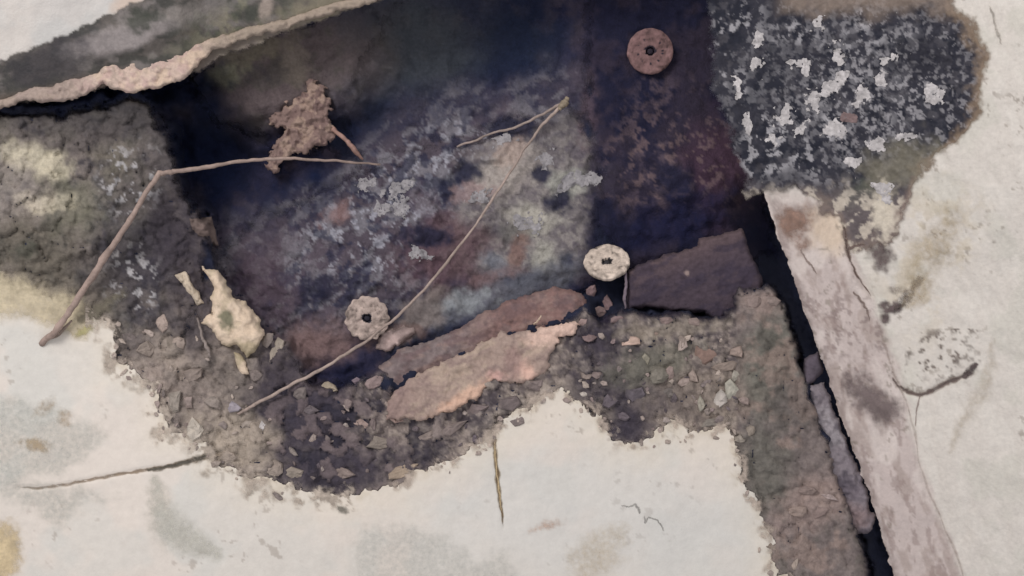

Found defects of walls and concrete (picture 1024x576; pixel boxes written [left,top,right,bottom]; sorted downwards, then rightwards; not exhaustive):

flaking render [0,0,377,109]
flaking render [264,79,336,174]
rust [584,0,779,277]
damp [707,0,989,270]
flaking render [190,216,218,246]
damp [0,0,604,387]
crack [843,227,870,320]
damp [880,278,925,323]
flaking render [85,266,875,576]
crack [893,363,978,426]
crack [23,453,219,490]